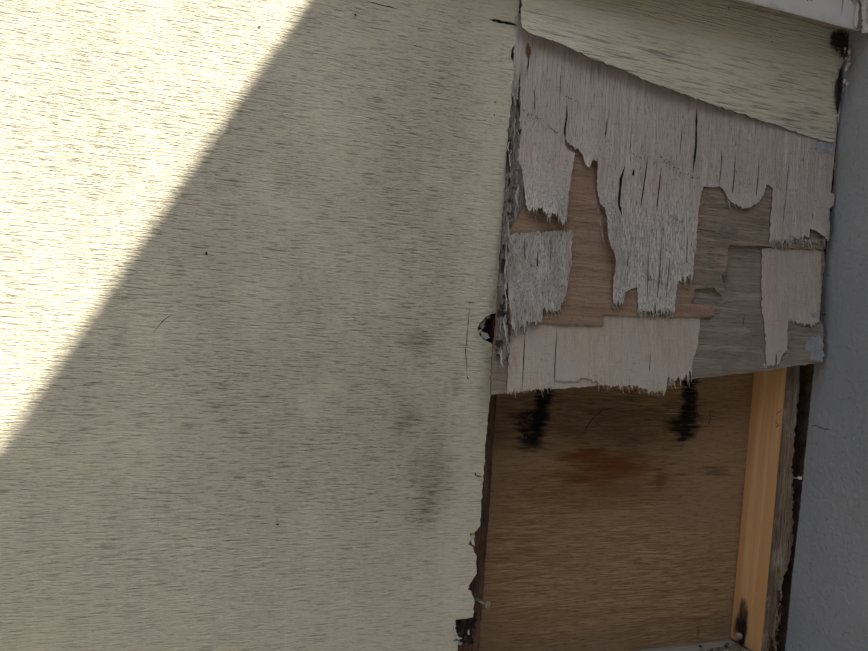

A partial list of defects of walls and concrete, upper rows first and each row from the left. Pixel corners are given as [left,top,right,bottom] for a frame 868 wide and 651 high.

crack [855,0,863,30]
peeling [507,230,573,337]
water stain [513,388,554,448]
peeling [551,378,602,389]
water stain [668,378,700,441]